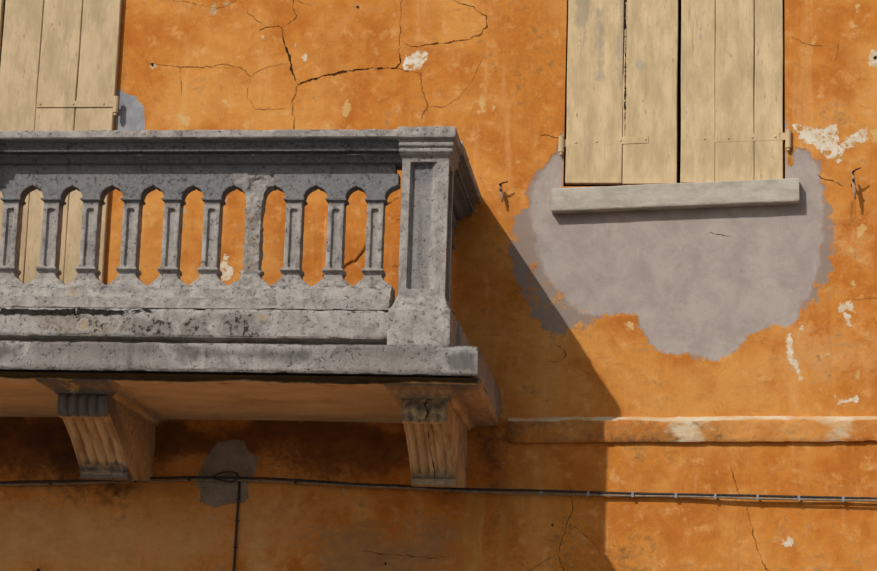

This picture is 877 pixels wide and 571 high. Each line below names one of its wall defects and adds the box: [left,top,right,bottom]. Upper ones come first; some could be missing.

flaking render [115,87,146,131]
crack [137,0,488,130]
flaking render [498,114,877,382]
water stain [0,417,525,571]
crack [729,465,770,571]